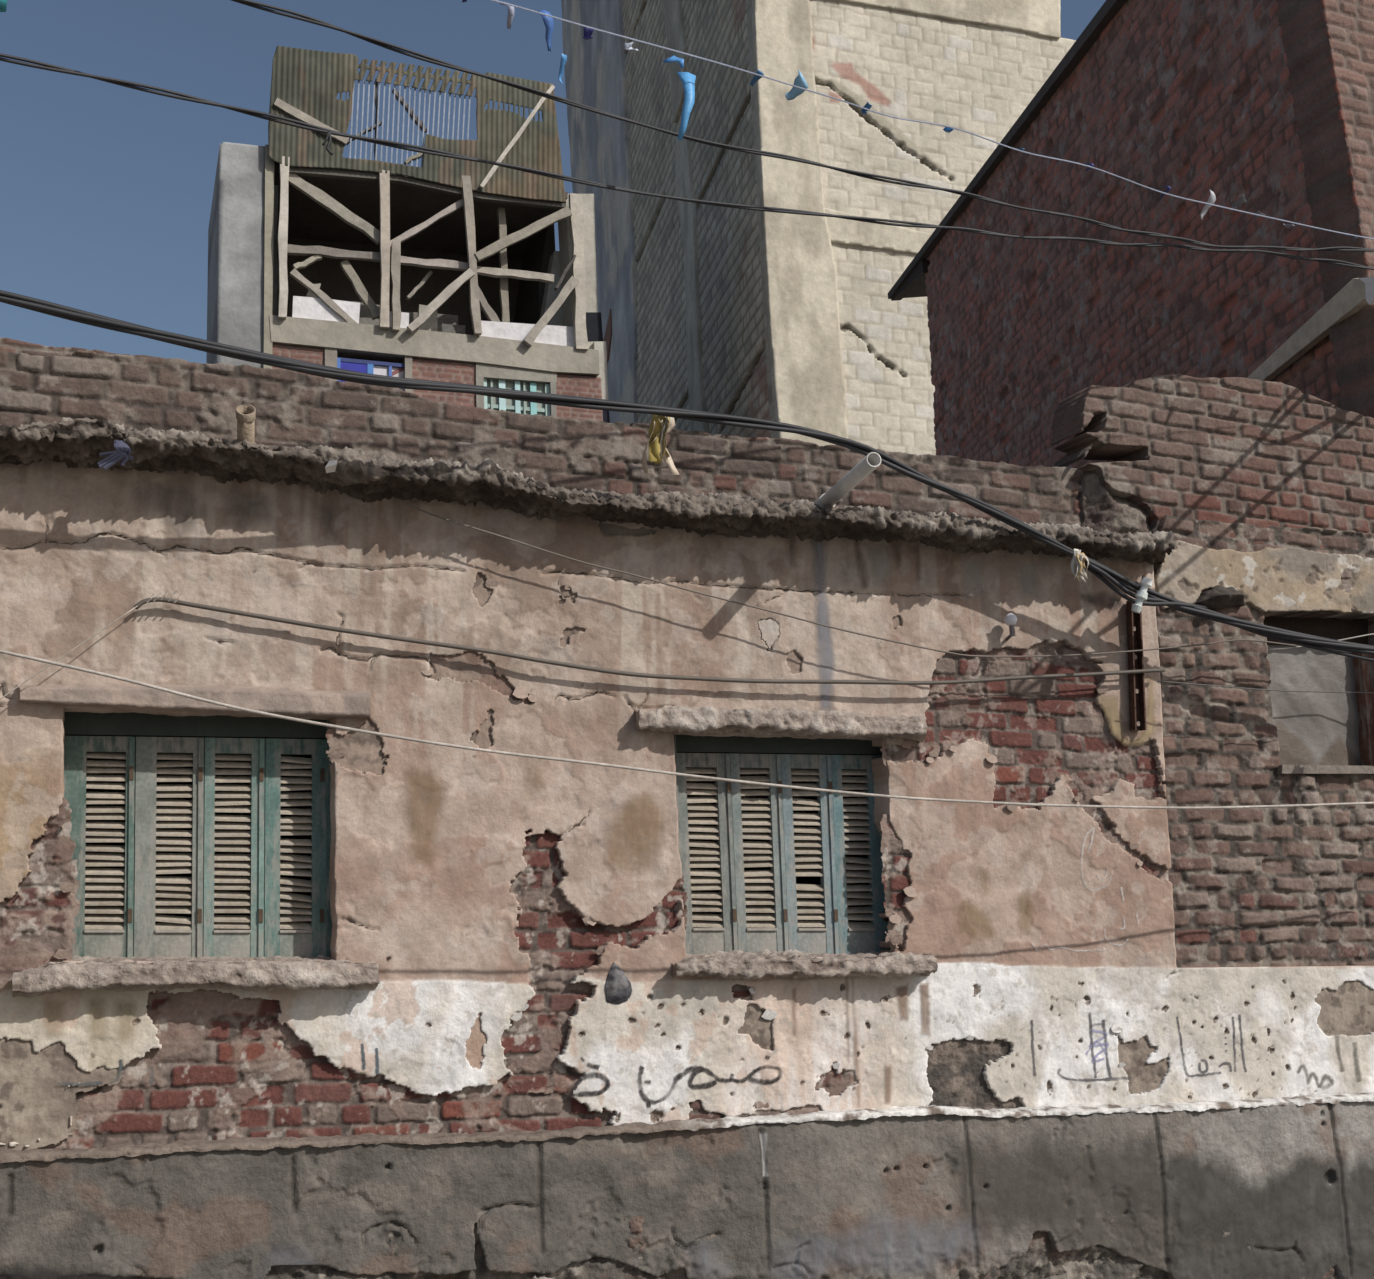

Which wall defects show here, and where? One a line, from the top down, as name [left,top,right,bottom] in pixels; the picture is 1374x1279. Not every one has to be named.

crack [4,520,461,571]
flaking render [421,651,537,704]
peeling [758,619,802,674]
flaking render [470,709,494,749]
flaking render [880,640,1163,812]
flaking render [0,797,80,991]
flaking render [0,829,688,1151]
peeling [723,984,777,1051]
peeling [1315,980,1374,1037]
flaking render [650,1052,860,1123]
flaking render [926,1035,1023,1110]